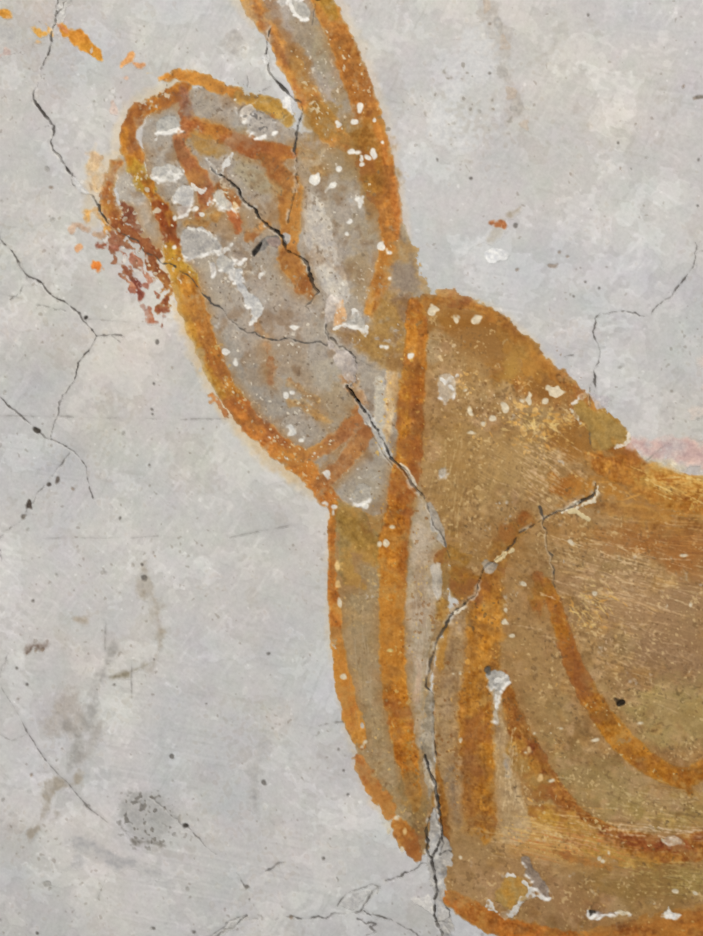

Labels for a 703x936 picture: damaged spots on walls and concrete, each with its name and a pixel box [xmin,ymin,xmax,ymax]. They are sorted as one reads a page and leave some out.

peeling [234,99,279,141]
peeling [347,141,385,167]
peeling [150,161,264,326]
crack [33,0,451,601]
crack [569,245,703,454]
crack [0,238,123,561]
crack [276,484,601,936]
peeling [485,666,512,726]
crack [150,797,207,848]
crack [212,916,257,936]
peeling [485,856,552,921]
peeling [586,910,632,921]